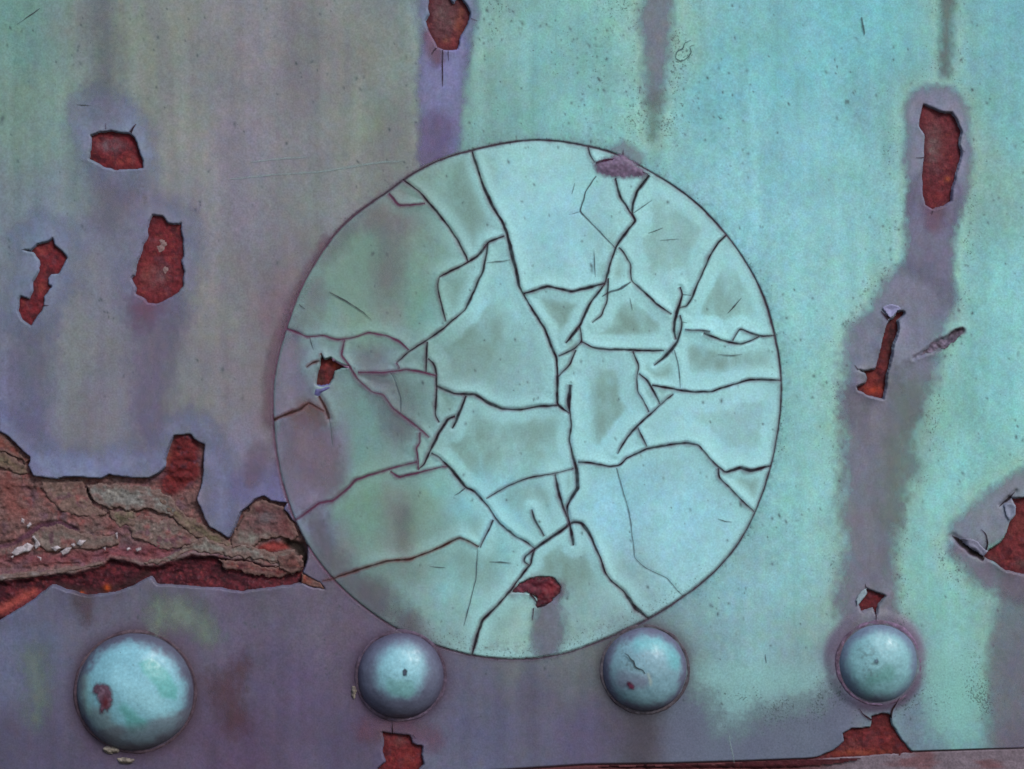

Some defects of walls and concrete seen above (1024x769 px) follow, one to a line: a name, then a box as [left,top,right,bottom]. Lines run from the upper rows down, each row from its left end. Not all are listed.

peeling [426,0,475,83]
peeling [90,124,143,170]
peeling [919,105,961,213]
peeling [19,239,67,325]
peeling [132,216,184,304]
crack [274,396,333,444]
crack [286,147,781,654]
spalling [0,432,324,620]
peeling [952,492,1024,574]
peeling [513,576,561,614]
corrosion [93,684,113,713]
peeling [808,699,913,759]